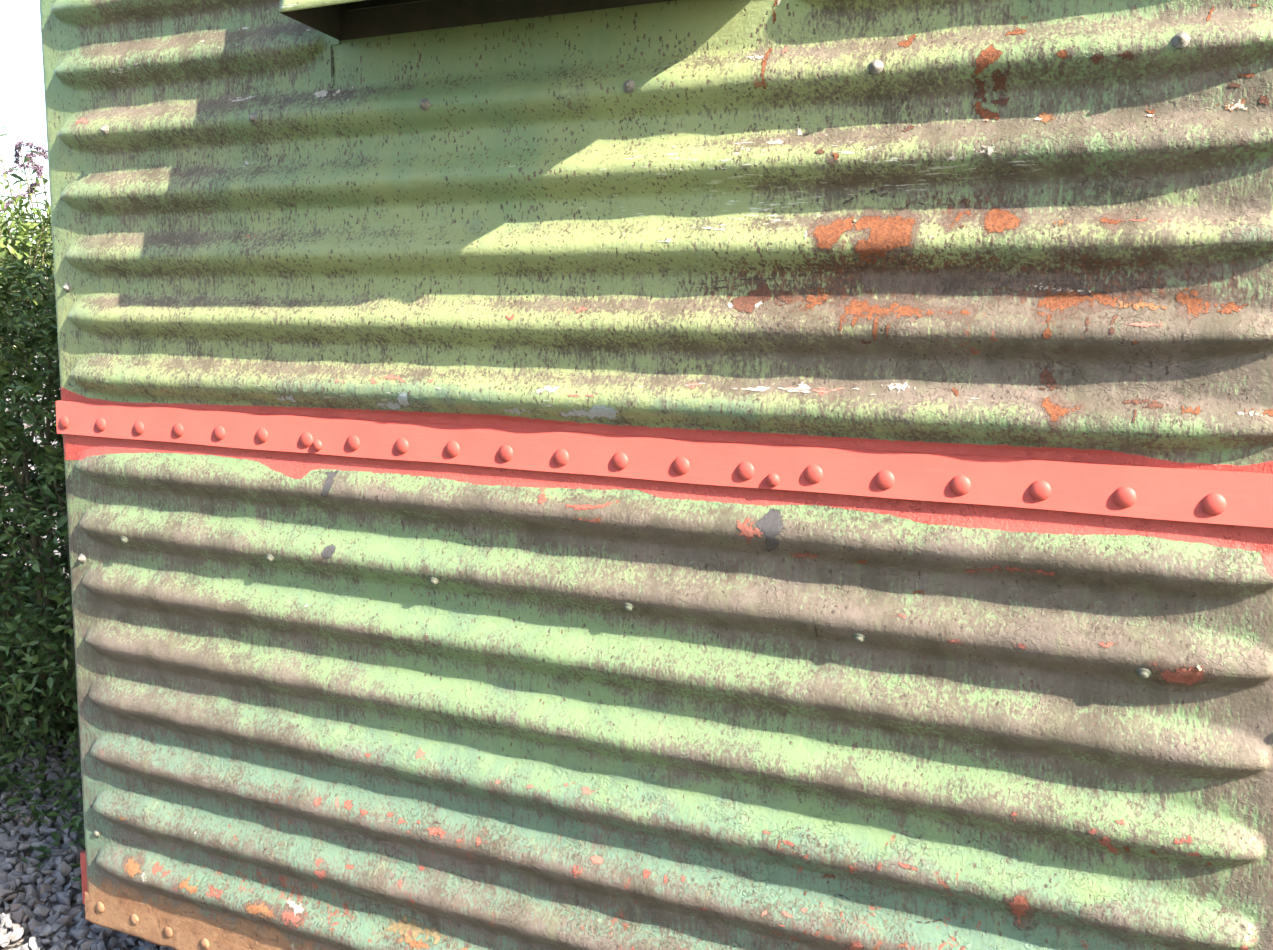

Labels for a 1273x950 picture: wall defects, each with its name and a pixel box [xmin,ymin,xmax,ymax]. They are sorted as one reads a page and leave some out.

rust [971,16,1028,122]
rust [802,207,922,265]
rust [944,198,1027,236]
rust [836,295,977,344]
rust [1029,283,1249,340]
peeling [313,797,369,816]
peeling [386,812,481,847]
peeling [314,857,326,880]
rust [244,897,304,928]